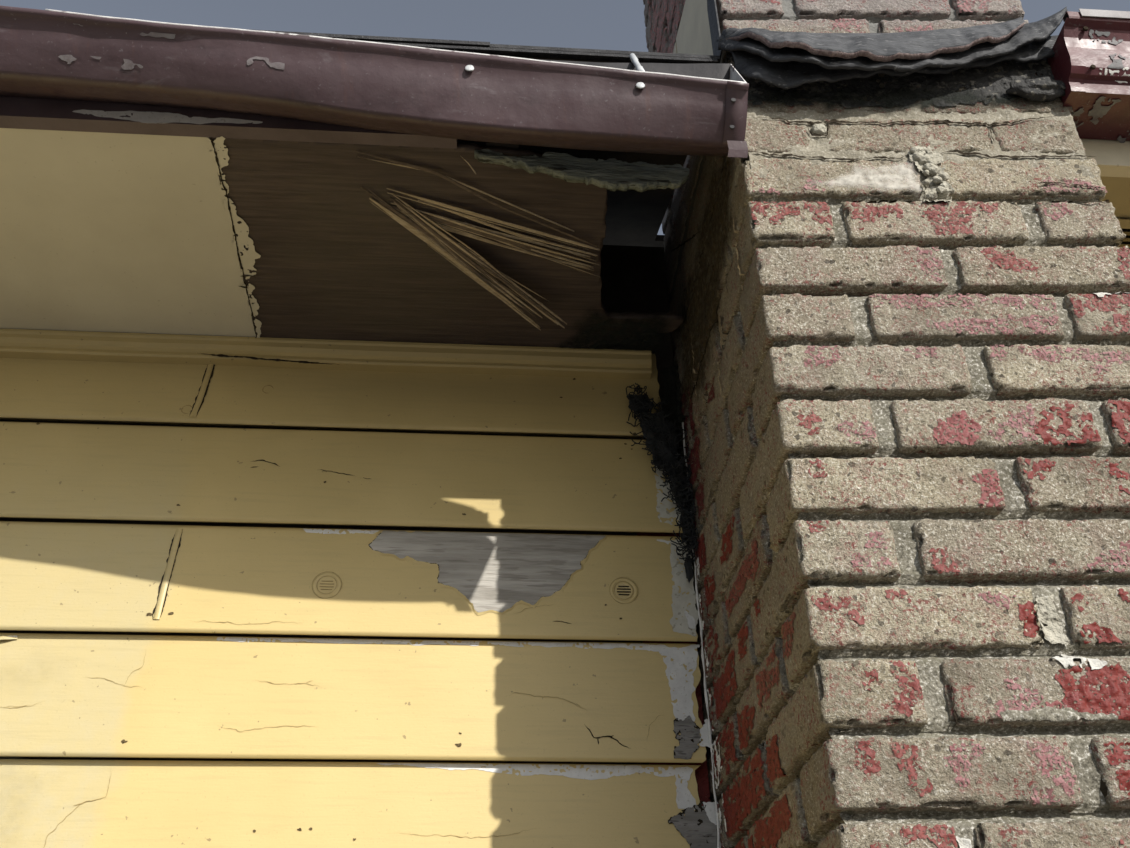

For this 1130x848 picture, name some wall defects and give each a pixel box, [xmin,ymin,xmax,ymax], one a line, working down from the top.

peeling [1089,29,1130,83]
peeling [1074,96,1121,128]
water stain [832,165,920,189]
peeling [72,110,262,338]
peeling [870,146,1130,374]
peeling [933,403,1101,446]
peeling [1108,398,1130,444]
peeling [1023,458,1056,480]
peeling [1105,459,1130,494]
peeling [217,399,796,848]
crack [509,692,660,749]
crack [44,776,111,847]